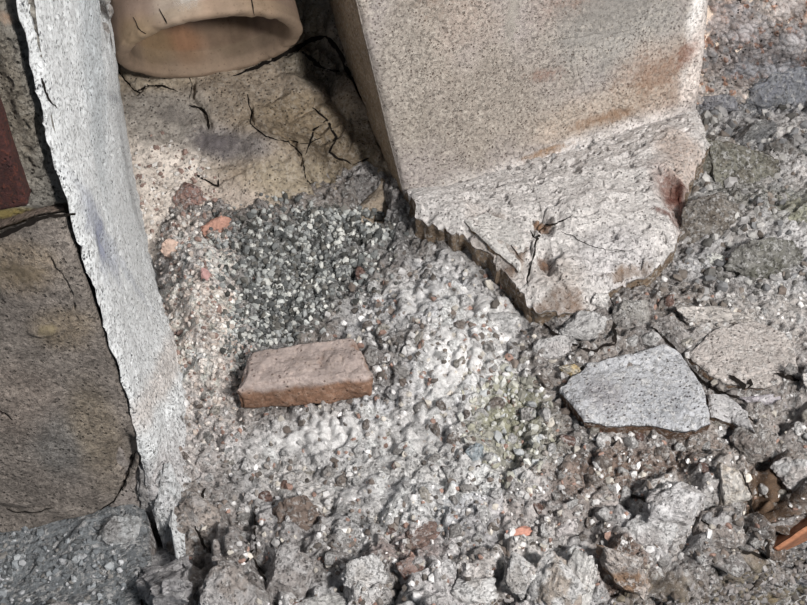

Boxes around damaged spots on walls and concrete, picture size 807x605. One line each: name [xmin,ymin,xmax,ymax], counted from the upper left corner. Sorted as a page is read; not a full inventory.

crack [233,35,363,101]
crack [118,70,210,130]
crack [247,94,369,184]
crack [0,213,76,238]
crack [197,173,219,187]
flaking render [464,212,525,276]
spalling [533,220,551,234]
crack [511,215,638,284]
spalling [614,267,645,282]
spalling [666,181,685,213]
crack [101,452,136,510]